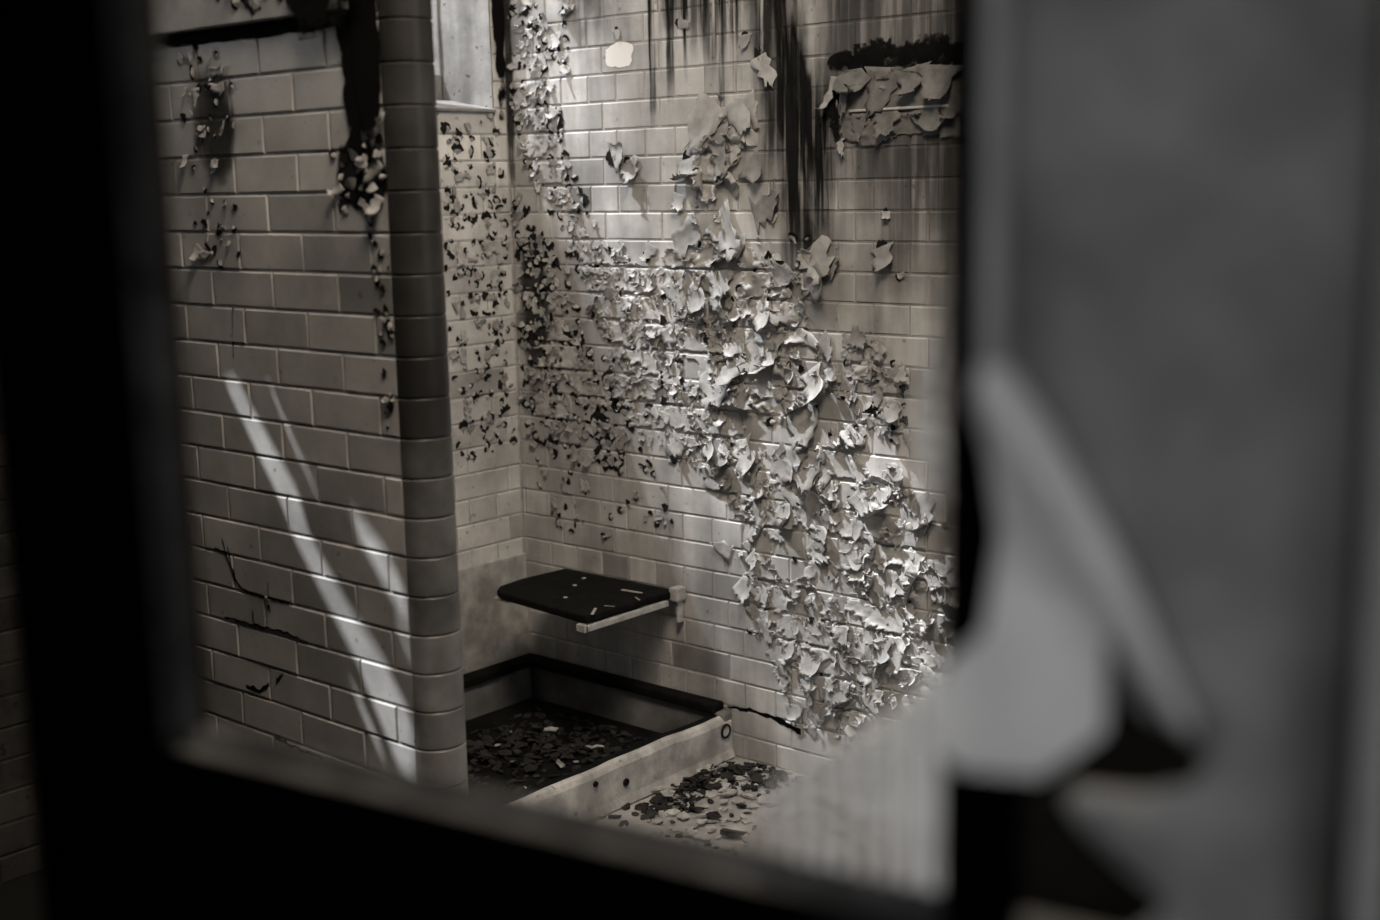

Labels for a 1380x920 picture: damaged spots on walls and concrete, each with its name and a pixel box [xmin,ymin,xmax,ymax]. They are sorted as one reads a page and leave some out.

peeling [217,0,282,15]
peeling [176,42,240,270]
peeling [325,110,395,348]
peeling [380,368,395,429]
peeling [440,0,946,741]
crack [214,539,308,643]
crack [246,673,283,693]